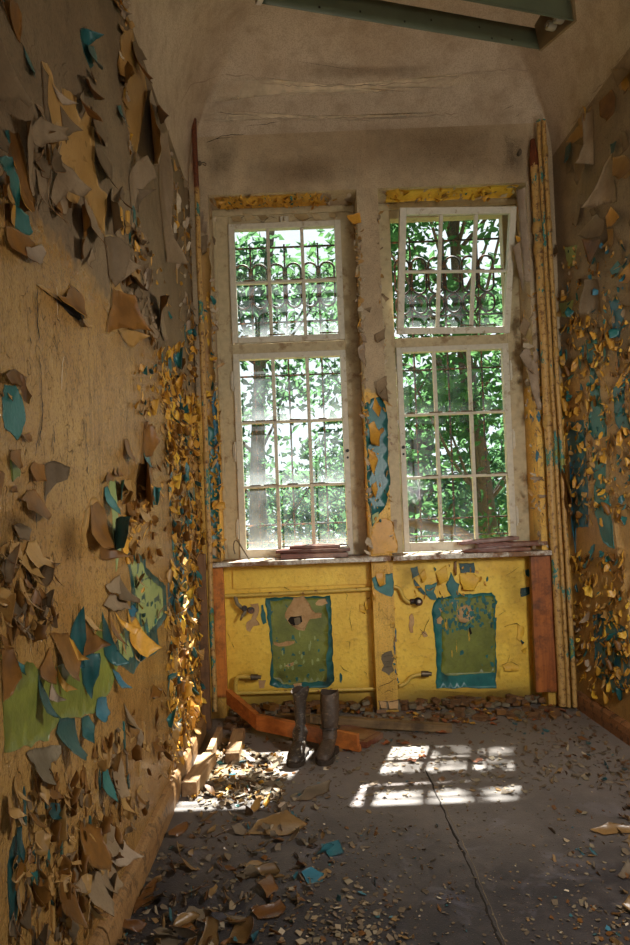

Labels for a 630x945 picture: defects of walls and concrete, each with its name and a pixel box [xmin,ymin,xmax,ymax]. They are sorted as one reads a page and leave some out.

peeling [0,0,401,945]
peeling [377,185,549,550]
peeling [553,68,630,705]
peeling [411,561,488,635]
peeling [520,569,530,597]
crack [425,768,506,945]
peeling [590,791,630,835]